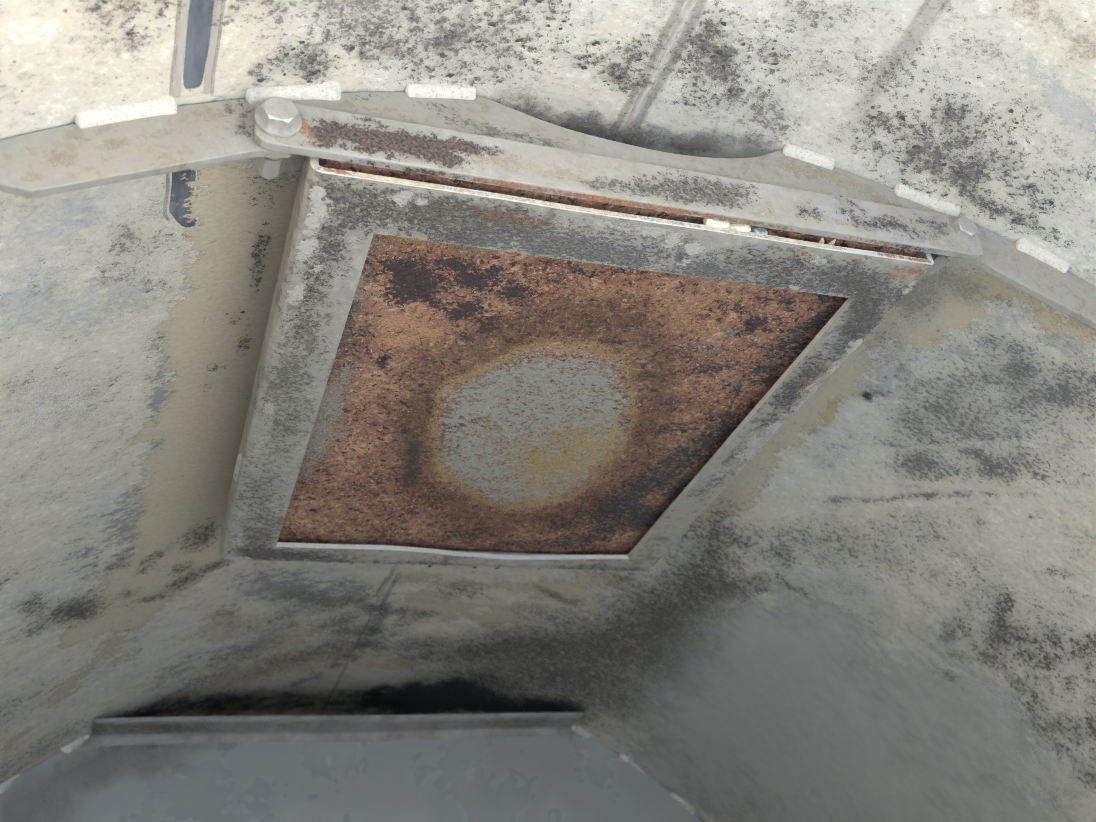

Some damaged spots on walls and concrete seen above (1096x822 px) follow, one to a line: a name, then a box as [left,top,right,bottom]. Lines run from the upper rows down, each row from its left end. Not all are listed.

leakage [315,166,700,228]
corrosion [453,176,786,230]
leakage [720,230,845,250]
leakage [33,158,301,710]
corrosion [361,308,460,354]
corrosion [429,337,640,511]
corrosion [550,265,781,365]
leakage [682,265,1096,538]
leakage [147,568,631,716]
leakage [630,597,1052,822]